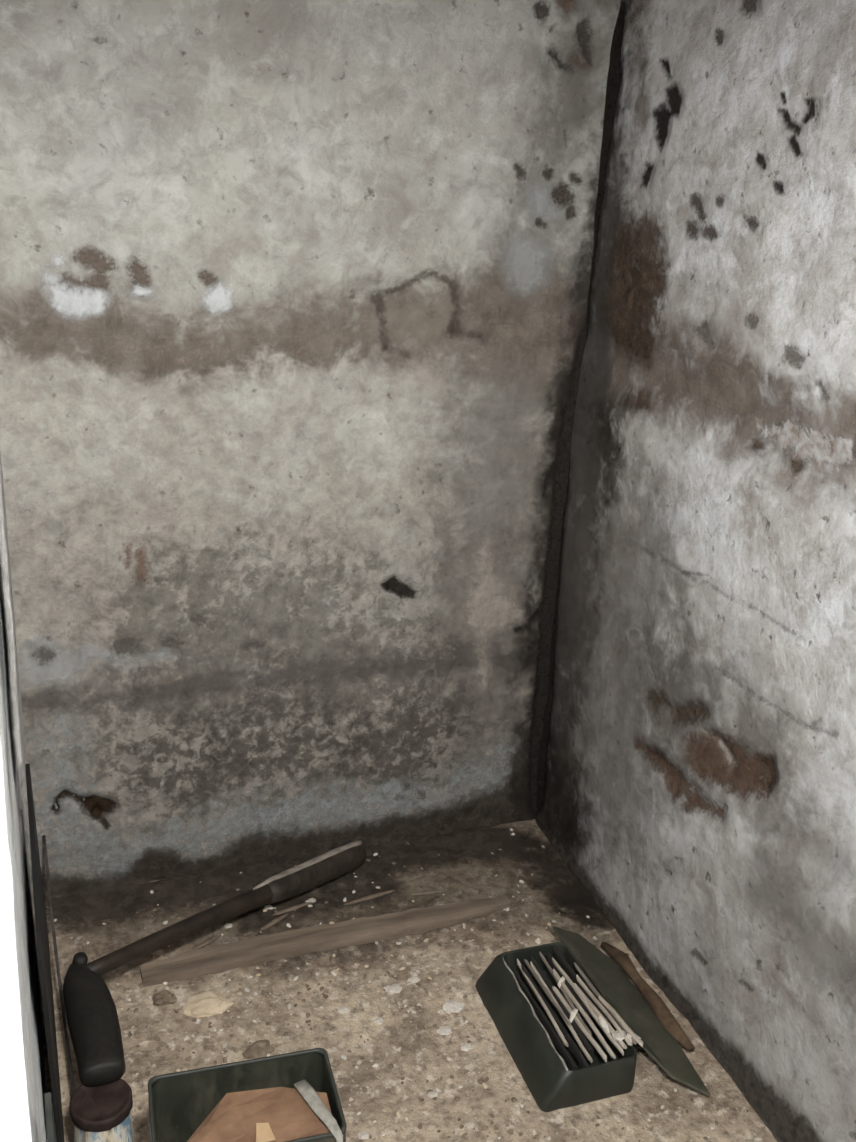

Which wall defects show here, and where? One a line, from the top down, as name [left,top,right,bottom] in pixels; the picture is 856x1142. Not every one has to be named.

peeling [45,246,151,318]
peeling [199,270,233,313]
water stain [16,166,600,625]
crack [515,1,625,818]
water stain [512,54,856,1142]
water stain [33,715,97,853]
water stain [42,741,529,932]
flaking render [634,691,776,818]